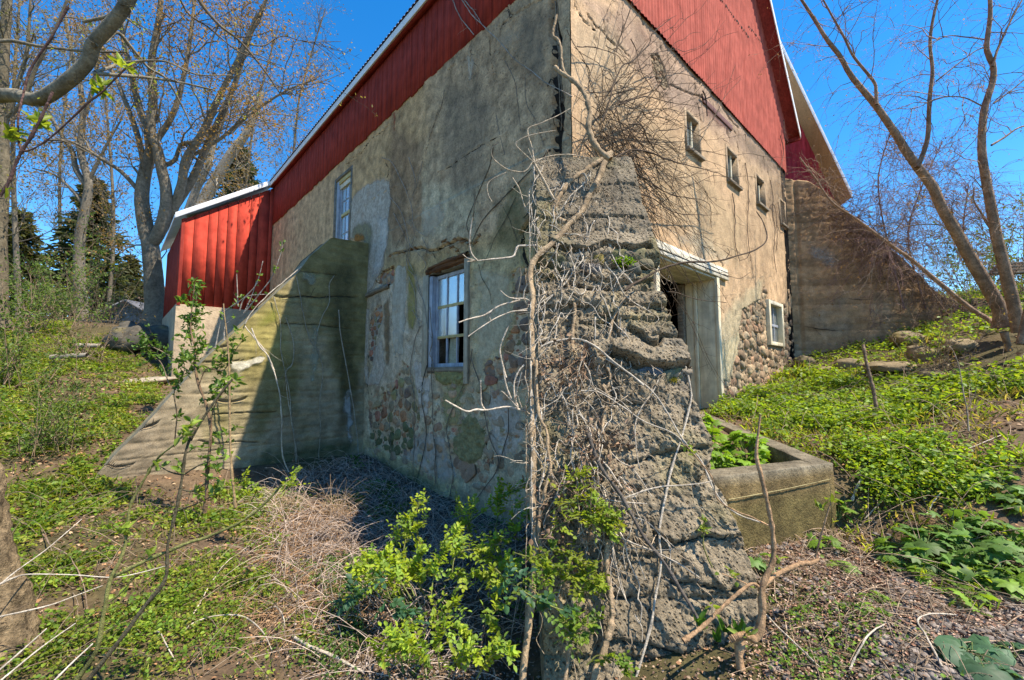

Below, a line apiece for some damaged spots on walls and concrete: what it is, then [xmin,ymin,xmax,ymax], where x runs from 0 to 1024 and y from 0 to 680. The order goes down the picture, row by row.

crack [449,0,627,158]
crack [276,233,481,358]
spalling [368,266,534,493]
spalling [724,288,795,399]